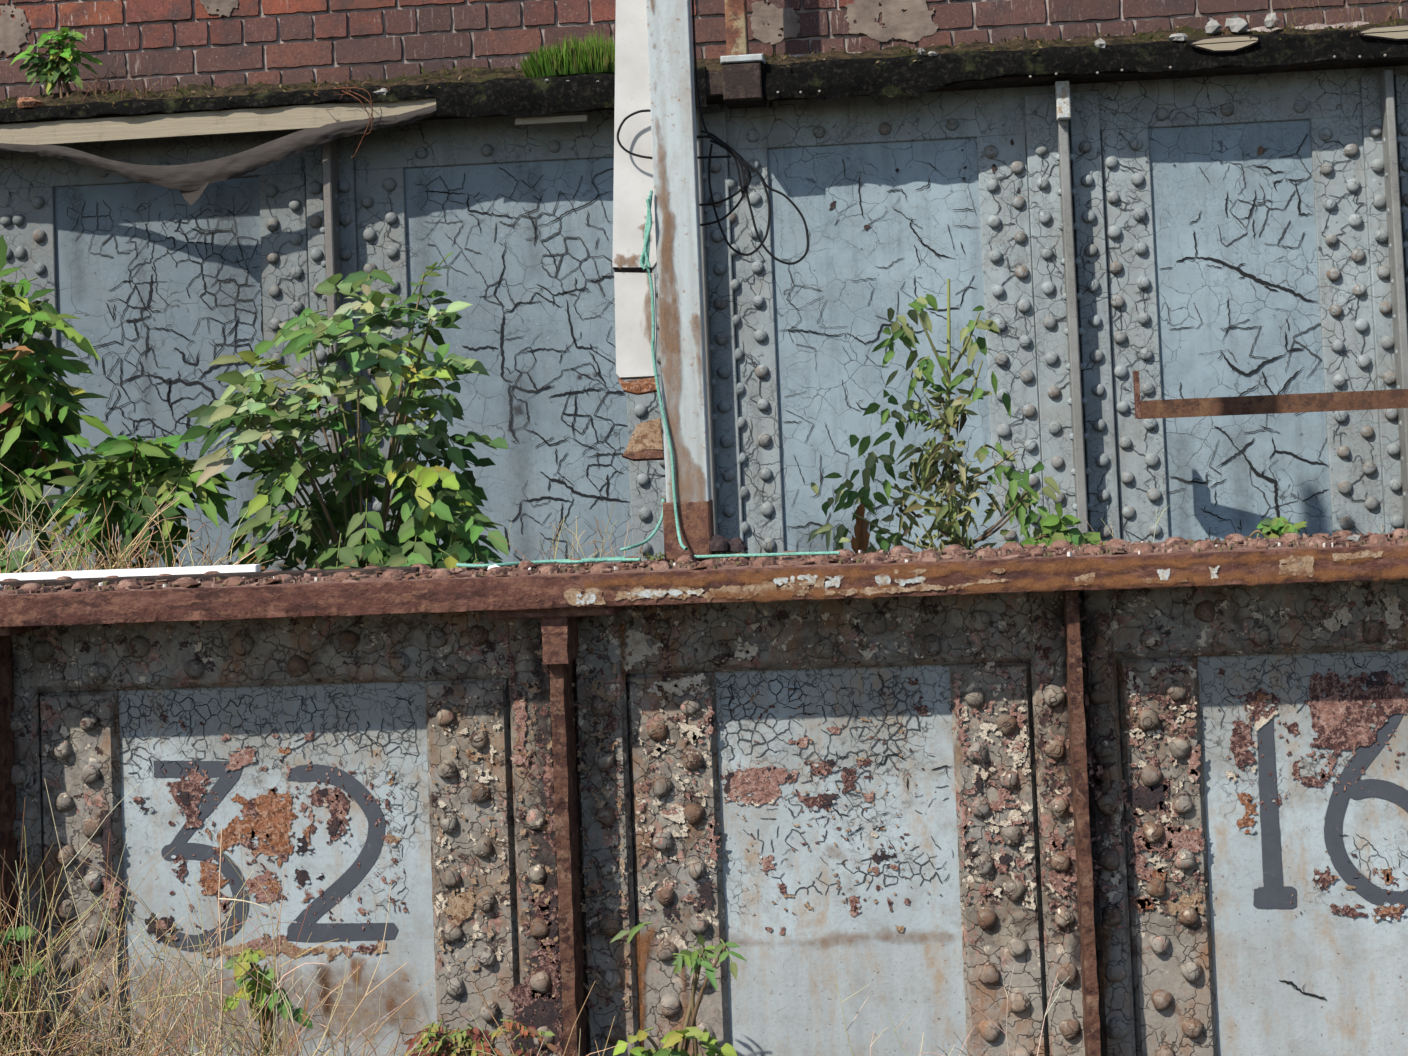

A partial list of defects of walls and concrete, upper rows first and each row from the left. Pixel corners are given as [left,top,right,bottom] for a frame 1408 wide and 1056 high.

crack [67,181,311,455]
crack [367,167,665,564]
crack [734,134,1382,553]
peeling [432,635,563,1056]
rust [635,928,654,1042]
peeling [564,568,1008,664]
crack [717,671,953,895]
peeling [572,604,1207,1011]
rust [585,550,1408,601]
rust [1072,931,1081,963]
rust [1058,604,1109,955]
peeling [1214,666,1408,834]